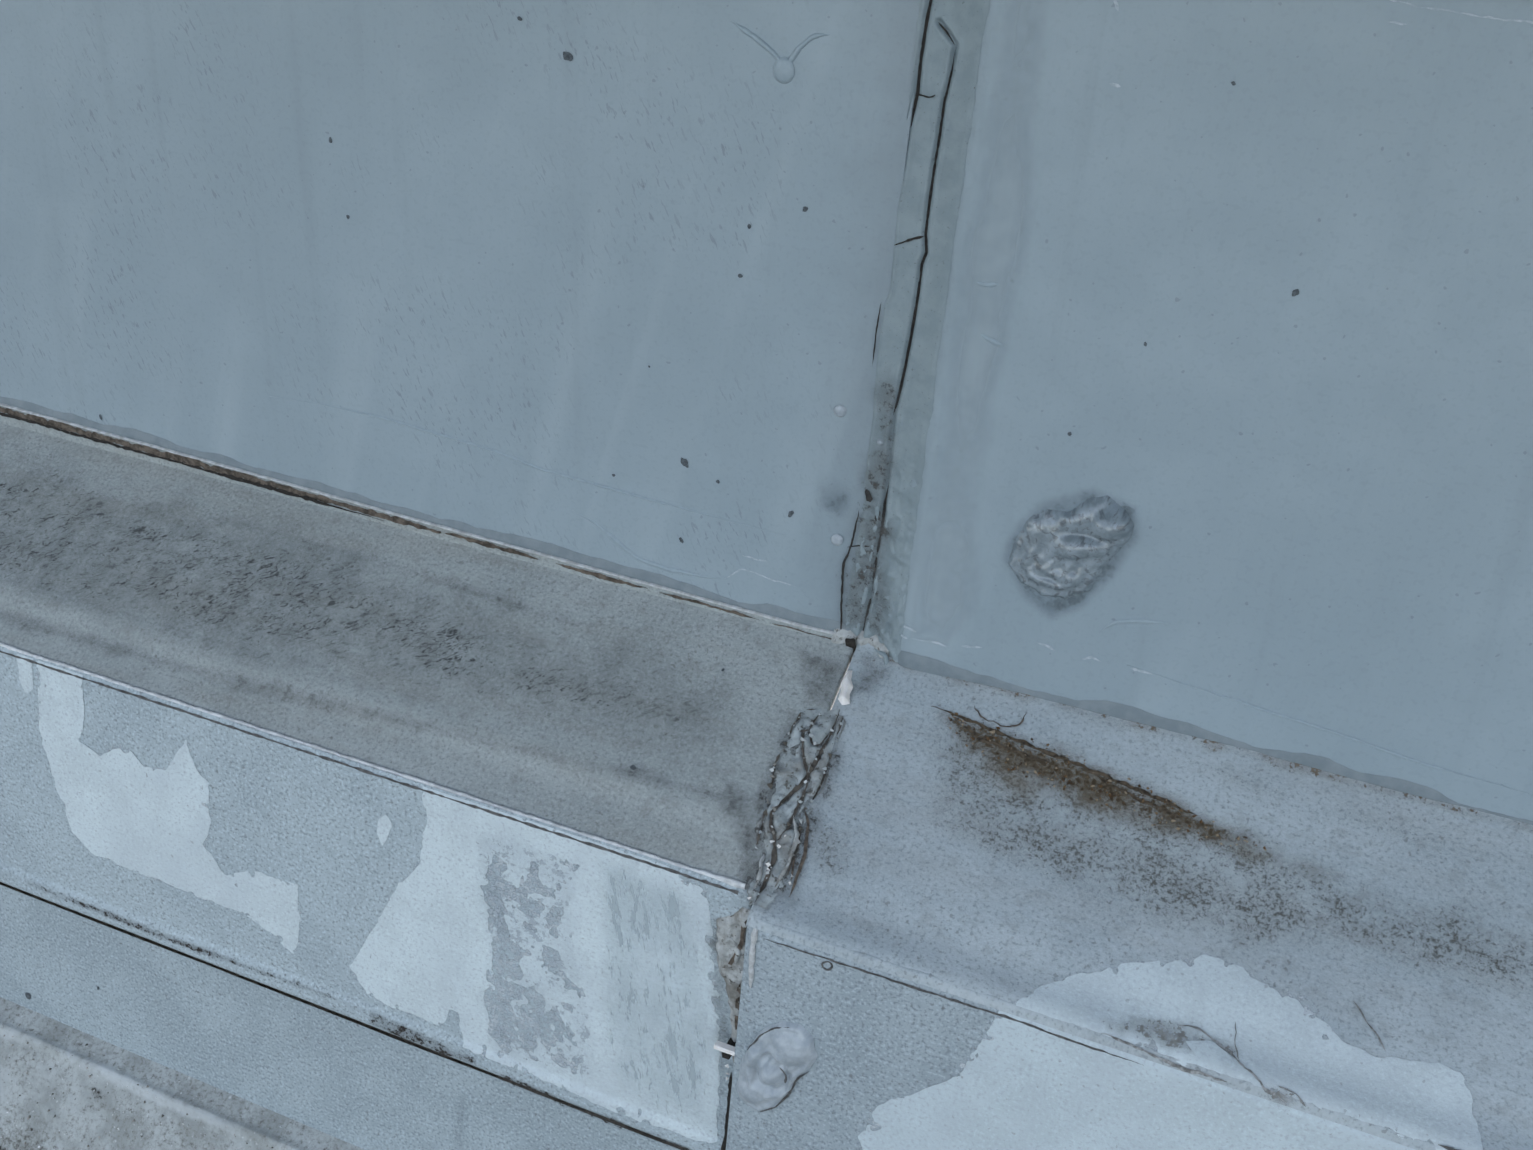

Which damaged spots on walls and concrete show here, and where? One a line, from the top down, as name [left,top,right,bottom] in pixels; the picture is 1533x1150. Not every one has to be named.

crack [872,0,975,415]
crack [840,484,889,664]
peeling [16,654,302,954]
peeling [349,786,730,1143]
crack [722,709,1142,1065]
rust [931,706,1266,854]
peeling [858,954,1483,1150]